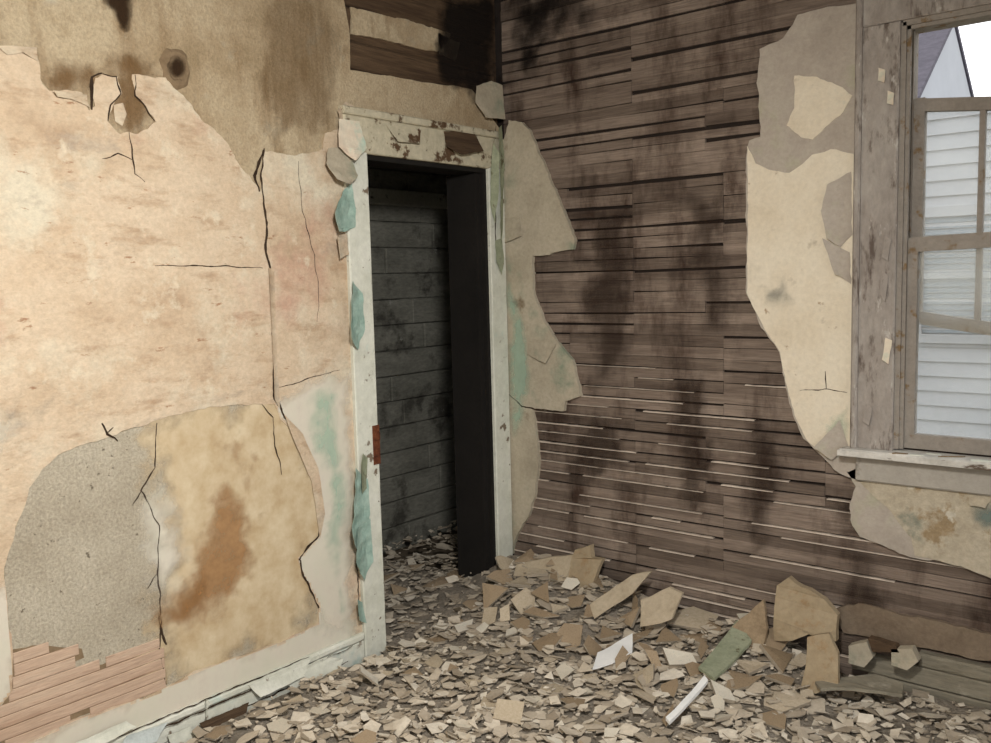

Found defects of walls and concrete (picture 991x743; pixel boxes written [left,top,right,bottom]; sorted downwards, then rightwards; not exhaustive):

leakage [106,0,130,30]
flaking render [0,0,521,274]
peeling [878,68,894,105]
flaking render [0,424,180,706]
crack [133,423,167,683]
peeling [41,374,373,743]
leakage [135,404,319,696]
crack [156,148,338,609]
peeling [351,282,365,349]
leakage [583,428,615,472]
peeling [882,338,892,364]